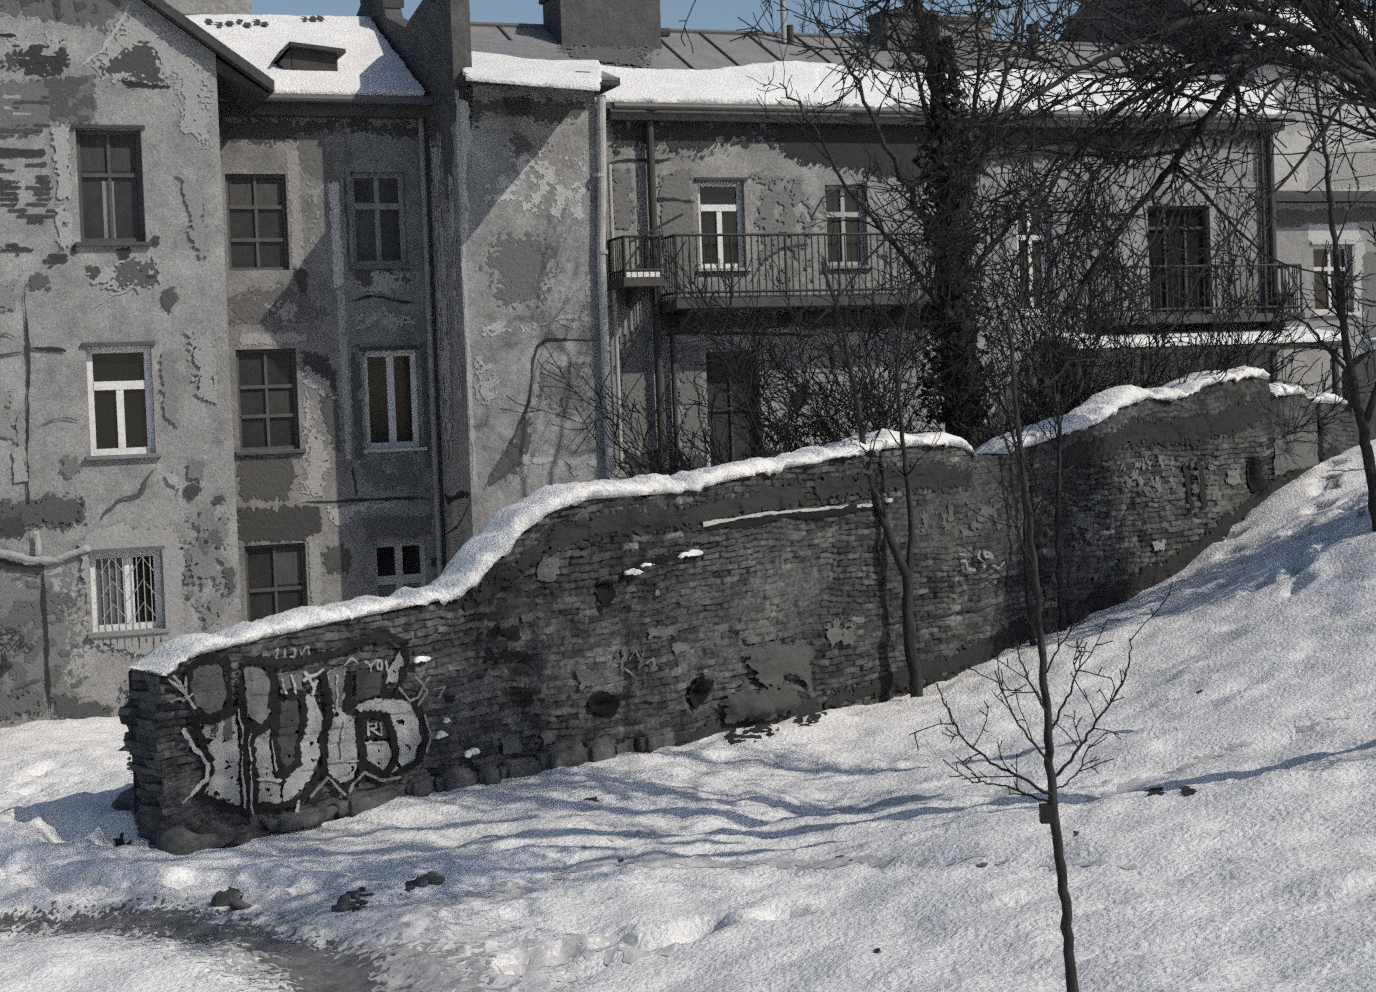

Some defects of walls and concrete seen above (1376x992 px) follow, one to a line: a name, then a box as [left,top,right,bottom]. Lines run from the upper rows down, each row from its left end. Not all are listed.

flaking render [0,0,215,295]
flaking render [430,90,604,505]
crack [101,468,157,521]
spalling [568,669,620,718]
spalling [689,672,715,710]